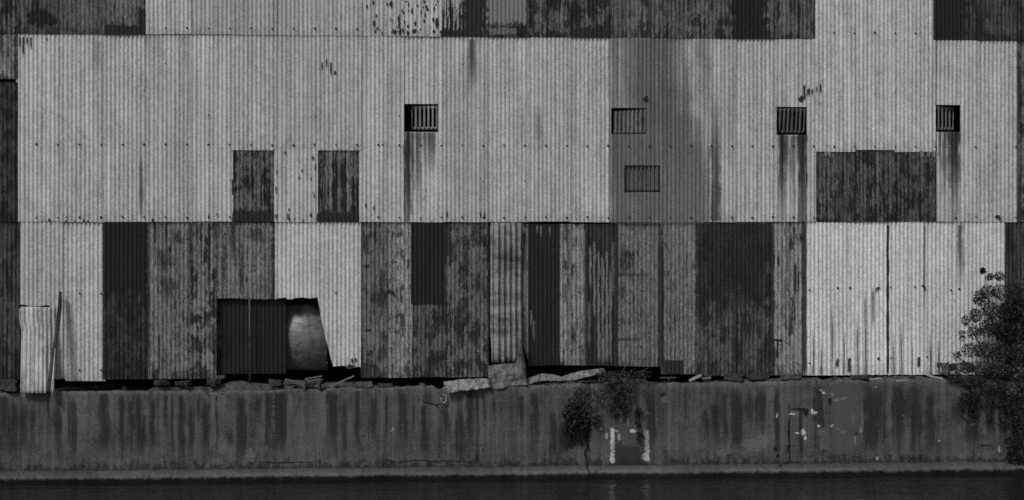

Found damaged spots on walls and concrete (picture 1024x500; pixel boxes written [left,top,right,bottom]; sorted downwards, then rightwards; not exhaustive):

rust [404,132,436,210]
rust [778,135,808,209]
rust [938,132,961,181]
rust [696,222,779,320]
water stain [47,394,77,441]
water stain [97,394,293,462]
water stain [319,391,425,446]
water stain [702,390,824,456]
water stain [863,389,935,441]